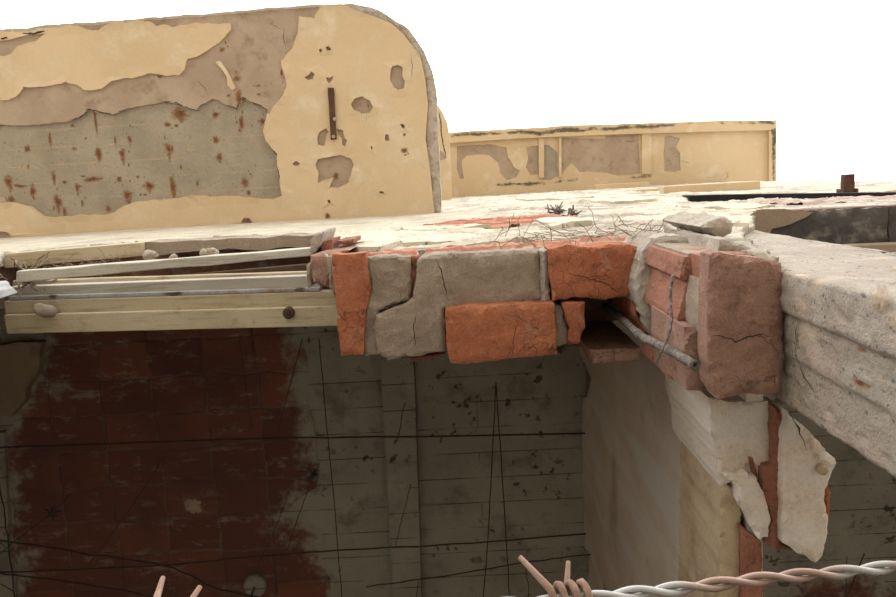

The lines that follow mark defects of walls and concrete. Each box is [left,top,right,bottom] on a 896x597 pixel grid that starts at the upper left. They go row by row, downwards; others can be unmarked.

spalling [0,4,322,217]
rust [164,107,188,159]
flaking render [316,128,354,188]
spalling [334,3,660,256]
flaking render [664,136,681,172]
rust [4,176,36,202]
rust [51,172,103,216]
rust [115,176,154,203]
crack [379,294,417,345]
damp [183,499,204,514]